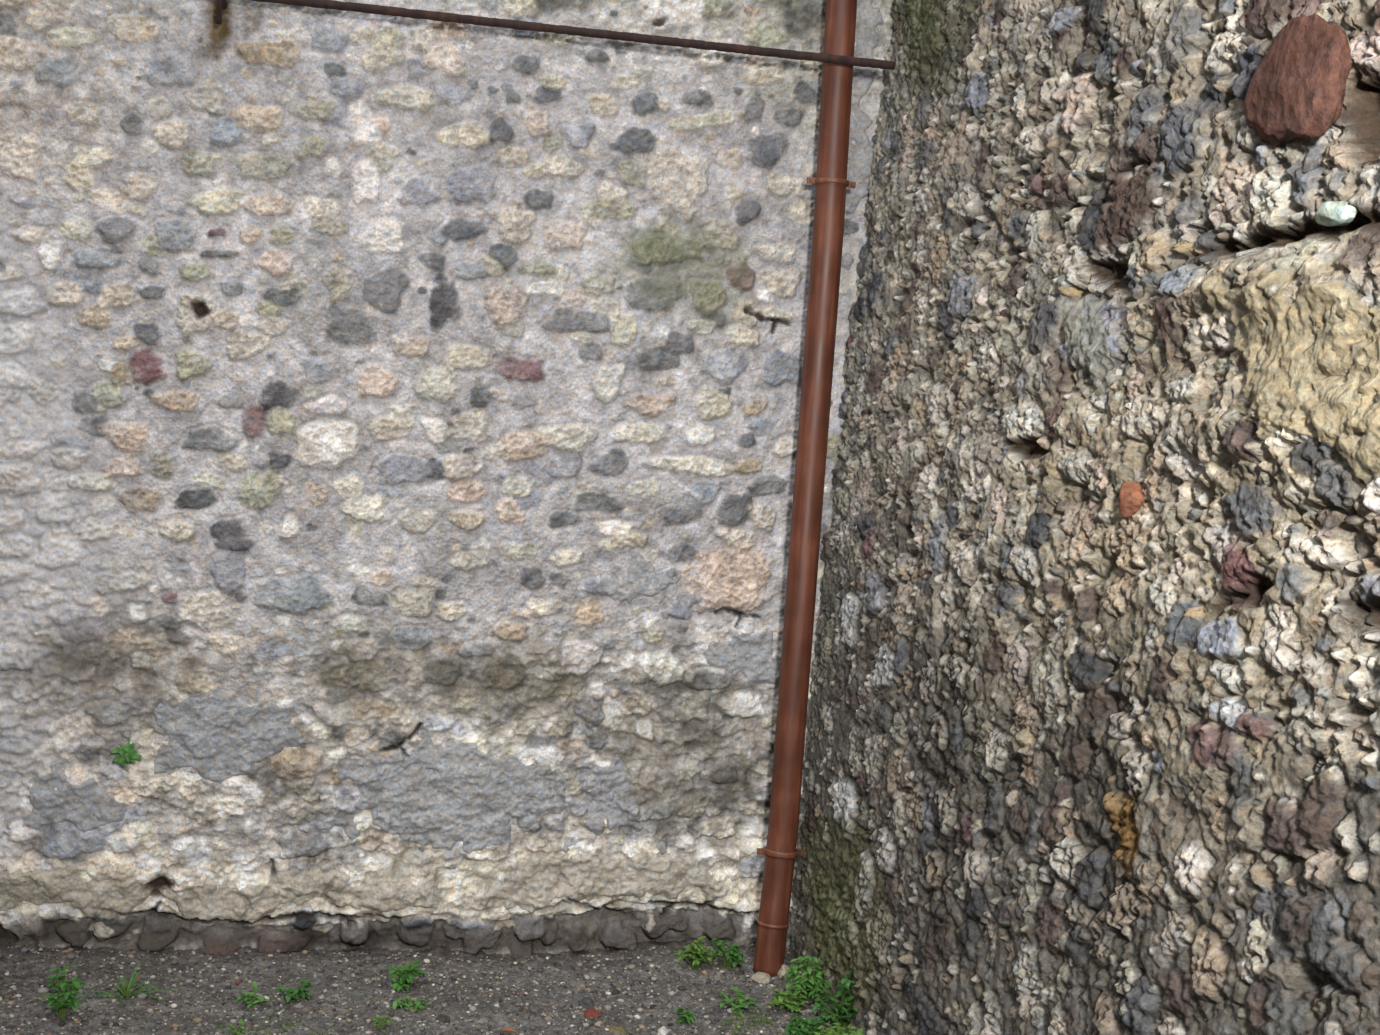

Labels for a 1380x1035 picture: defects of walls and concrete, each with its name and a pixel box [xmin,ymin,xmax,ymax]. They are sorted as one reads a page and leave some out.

crack [744,309,789,333]
crack [714,607,759,625]
crack [384,723,421,756]